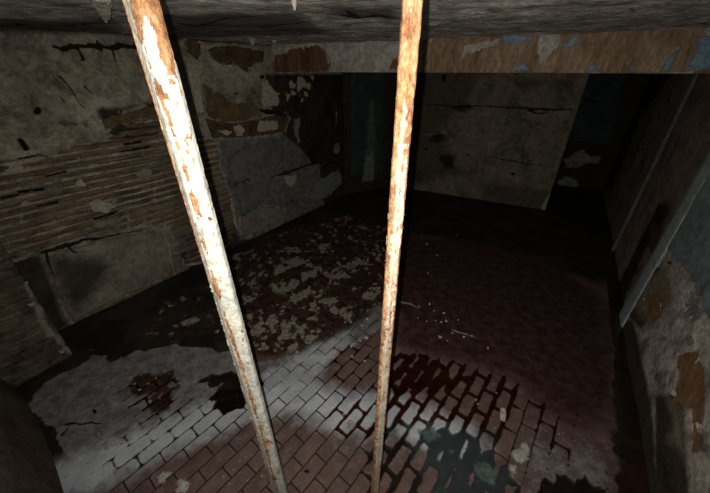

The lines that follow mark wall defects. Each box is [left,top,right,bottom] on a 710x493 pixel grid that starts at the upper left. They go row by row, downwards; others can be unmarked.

crack [10,22,137,62]
peeling [182,39,333,103]
peeling [420,29,710,74]
crack [416,104,572,114]
crack [40,228,184,276]
spalling [0,0,301,493]
peeling [667,172,710,323]
peeling [671,335,705,456]